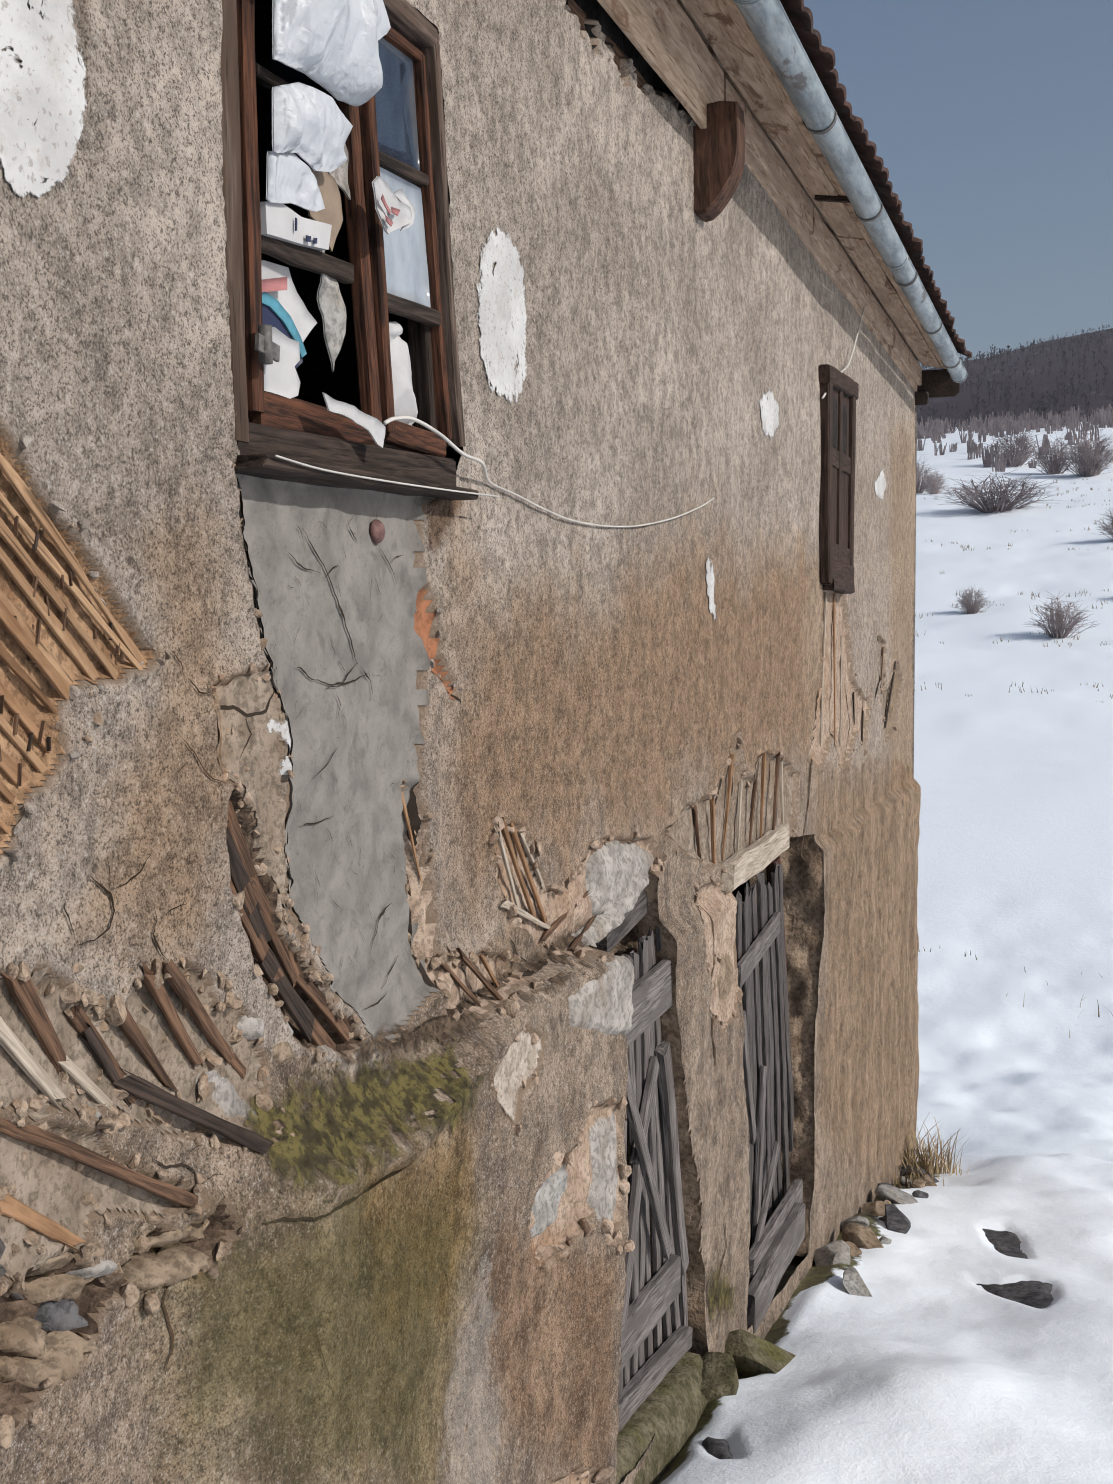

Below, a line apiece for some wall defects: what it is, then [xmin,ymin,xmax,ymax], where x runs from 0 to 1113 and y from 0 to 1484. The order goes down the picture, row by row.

spalling [565,0,696,127]
crack [166,478,402,899]
spalling [414,587,464,699]
peeling [3,802,37,862]
spalling [211,638,335,1004]
peeling [554,867,583,895]
peeling [665,737,783,836]
peeling [5,957,265,1103]
peeling [250,949,289,1022]
spalling [399,779,544,1135]
peeling [255,1065,295,1146]
peeling [0,1192,170,1315]